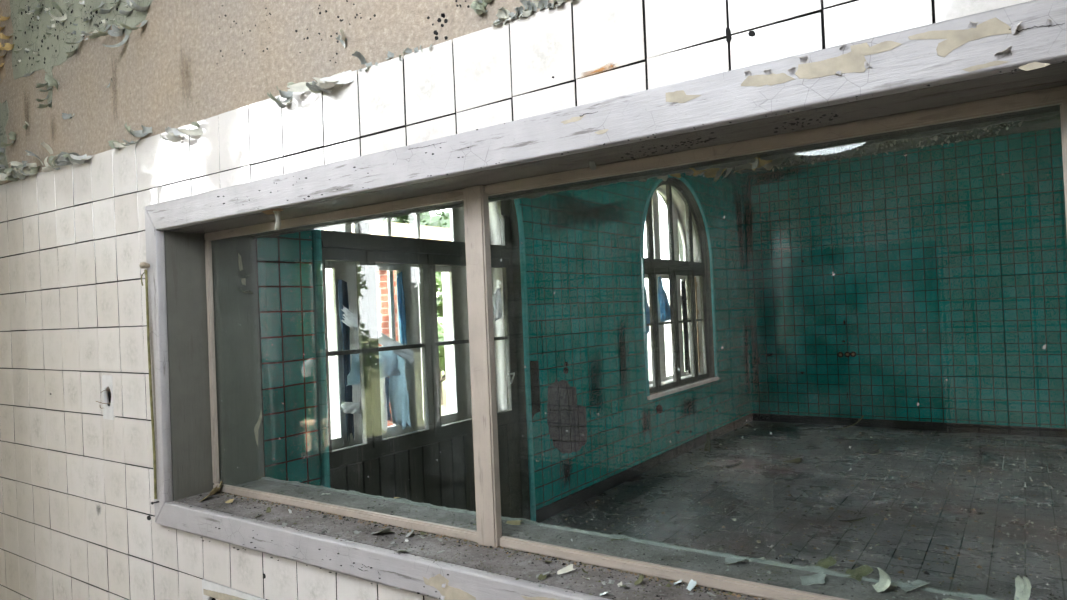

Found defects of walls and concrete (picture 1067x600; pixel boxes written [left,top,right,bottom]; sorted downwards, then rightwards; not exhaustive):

peeling [455,0,573,27]
peeling [0,0,153,120]
peeling [267,0,448,108]
peeling [741,17,1065,87]
peeling [108,122,203,150]
peeling [638,121,1023,182]
damp [618,332,627,383]
peeling [530,361,587,454]
peeling [410,573,476,600]
peeling [536,564,576,578]
peeling [800,556,930,593]
peeling [1014,575,1032,600]